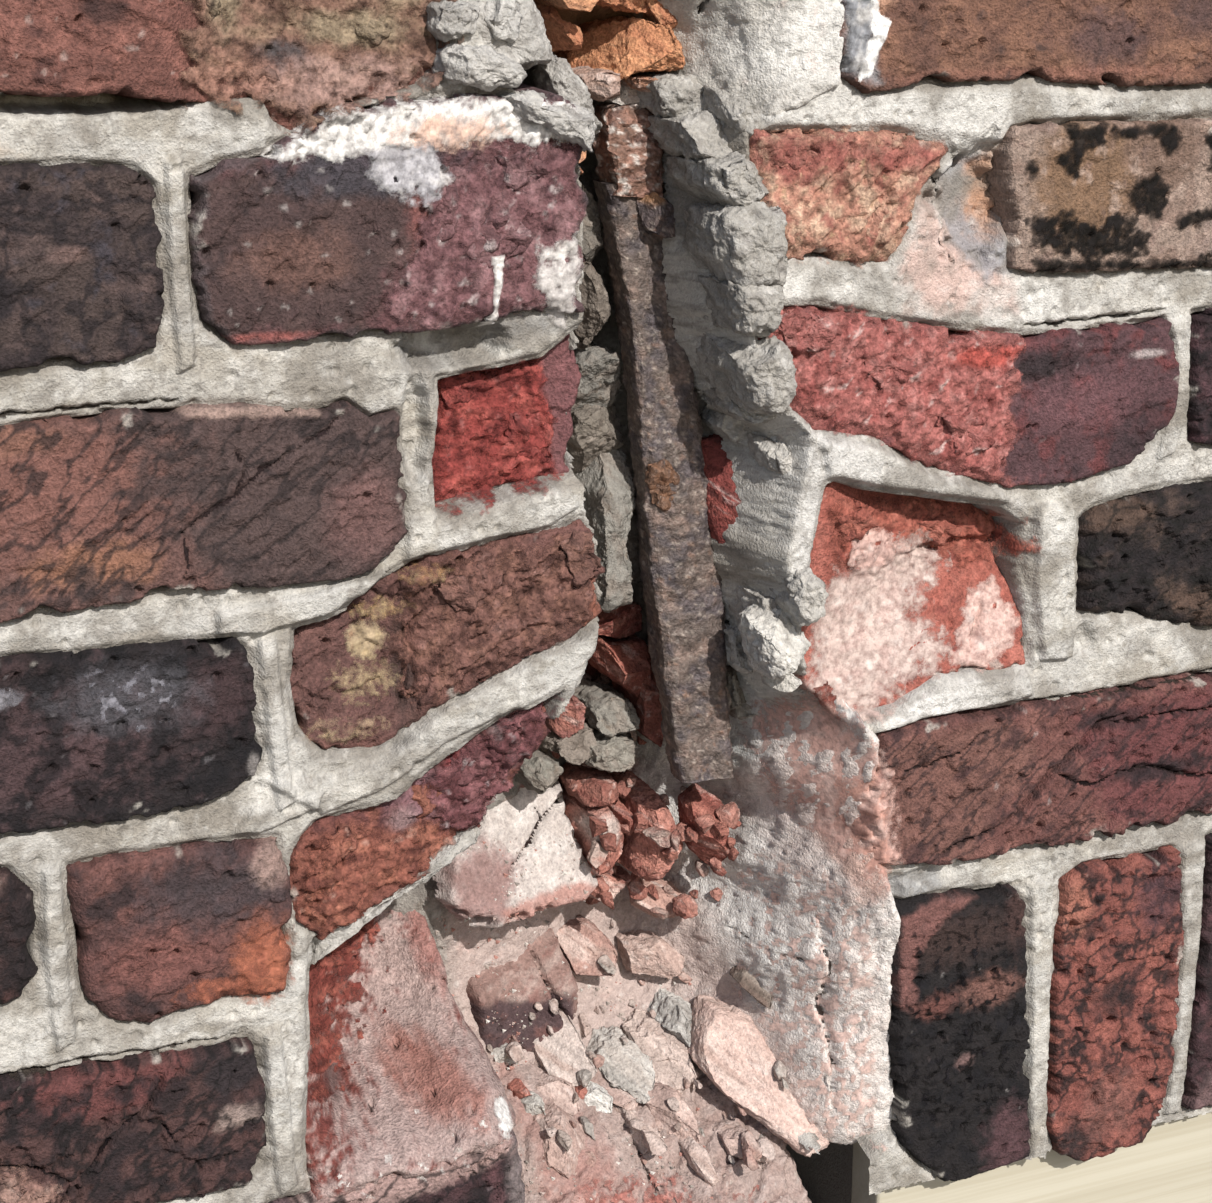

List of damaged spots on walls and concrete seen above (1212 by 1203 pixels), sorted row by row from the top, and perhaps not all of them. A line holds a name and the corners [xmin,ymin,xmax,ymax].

spalling [386,142,587,331]
corrosion [636,192,676,238]
spalling [757,126,948,265]
spalling [432,359,563,515]
corrosion [644,459,680,511]
spalling [769,306,1026,482]
spalling [388,530,601,704]
spalling [293,695,563,1104]
crack [511,797,559,865]
spalling [729,966,773,1009]
spalling [580,1174,692,1203]